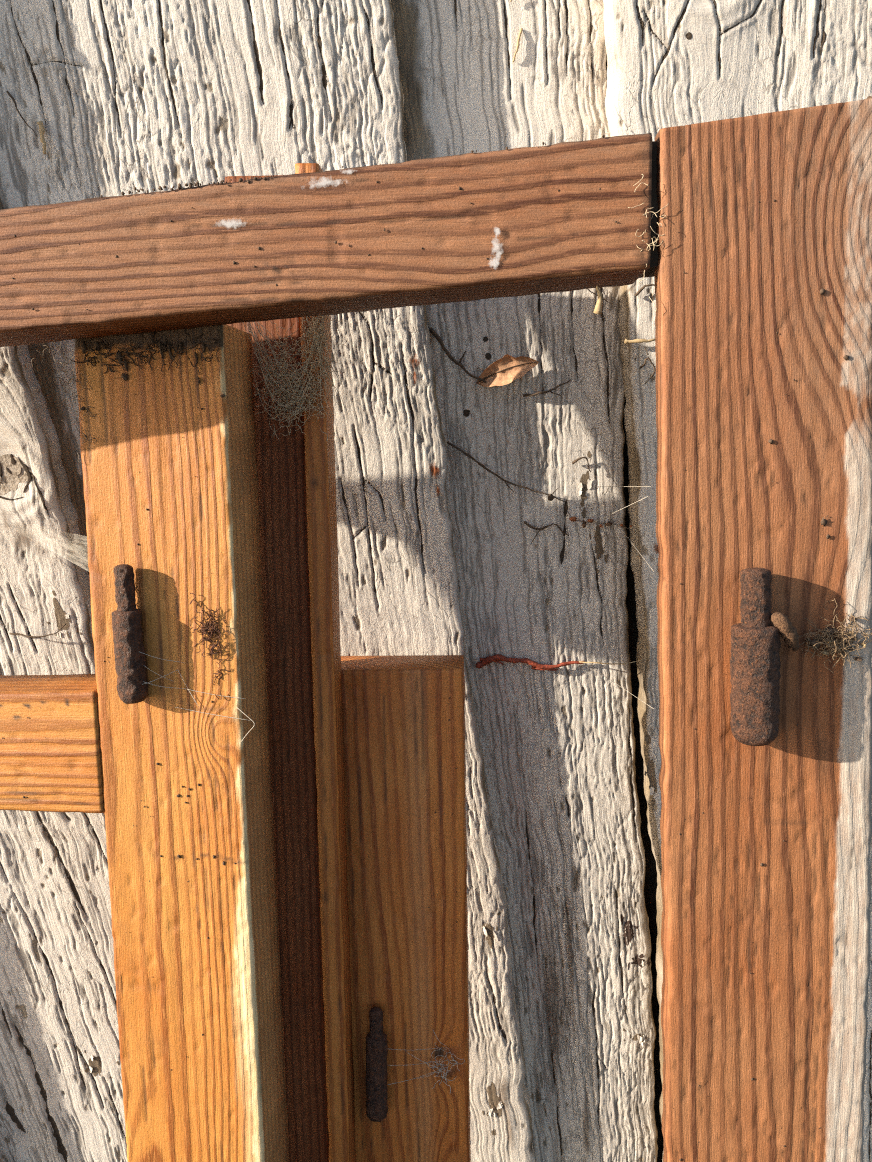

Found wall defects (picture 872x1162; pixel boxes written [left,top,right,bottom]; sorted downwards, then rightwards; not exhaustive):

crack [628,705,636,839]
crack [592,886,627,1129]